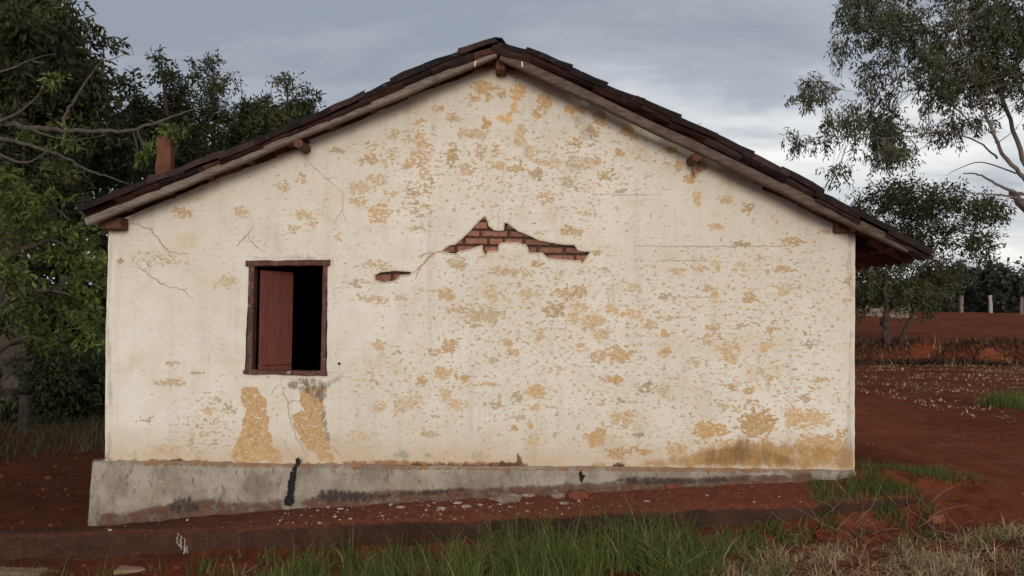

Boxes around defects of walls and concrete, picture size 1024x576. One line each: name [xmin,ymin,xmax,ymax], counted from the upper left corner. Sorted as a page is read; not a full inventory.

crack [302,154,349,228]
crack [128,223,192,298]
crack [413,250,449,279]
peeling [107,73,853,483]
leakage [617,441,852,484]